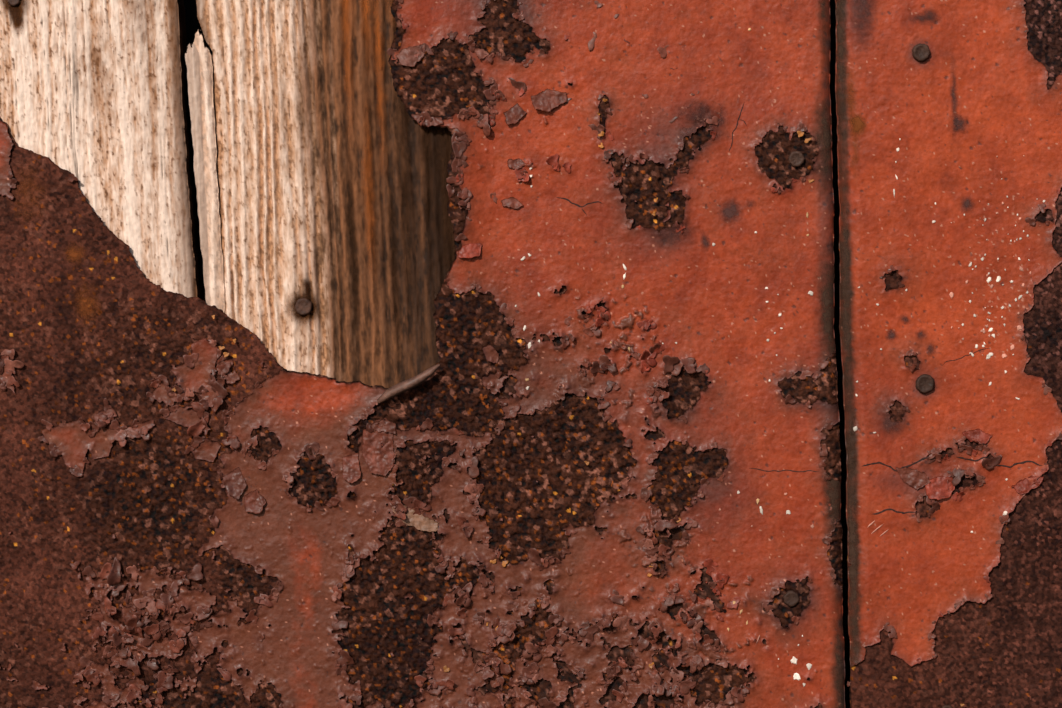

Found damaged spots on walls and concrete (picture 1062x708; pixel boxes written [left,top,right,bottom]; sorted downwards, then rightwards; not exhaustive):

corrosion [363,0,550,142]
corrosion [589,94,719,234]
corrosion [1021,187,1062,413]
corrosion [0,140,340,708]
peeling [146,339,258,455]
peeling [331,418,406,483]
peeling [384,494,438,532]
corrosion [331,272,728,708]
peeling [423,518,747,708]
peeling [631,341,696,405]
corrosion [818,417,1062,708]
peeling [896,429,1001,505]